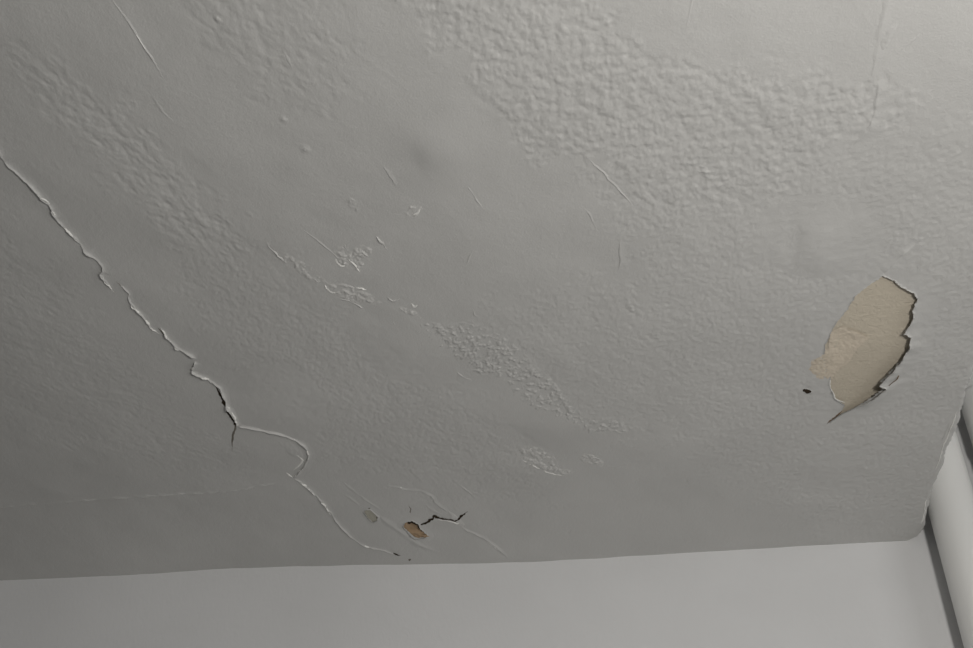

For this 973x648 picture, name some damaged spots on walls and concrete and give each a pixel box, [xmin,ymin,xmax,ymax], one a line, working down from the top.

crack [112,0,176,126]
crack [0,139,411,561]
peeling [799,241,944,437]
spalling [397,508,467,542]